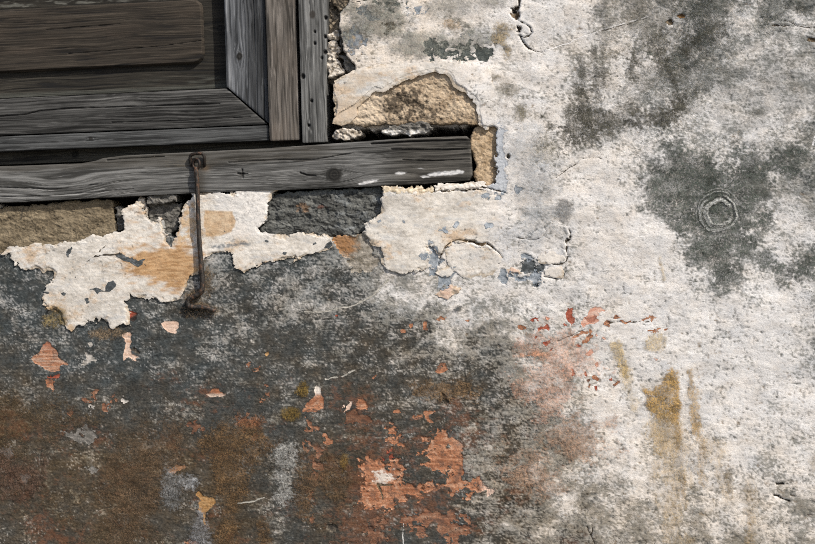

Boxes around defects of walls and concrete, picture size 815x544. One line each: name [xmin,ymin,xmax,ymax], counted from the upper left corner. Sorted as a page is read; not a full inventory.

crack [518,0,540,52]
water stain [541,0,815,300]
flaking render [0,0,566,361]
peeling [31,341,68,392]
peeling [81,342,97,366]
peeling [206,388,226,397]
corrosion [643,368,700,449]